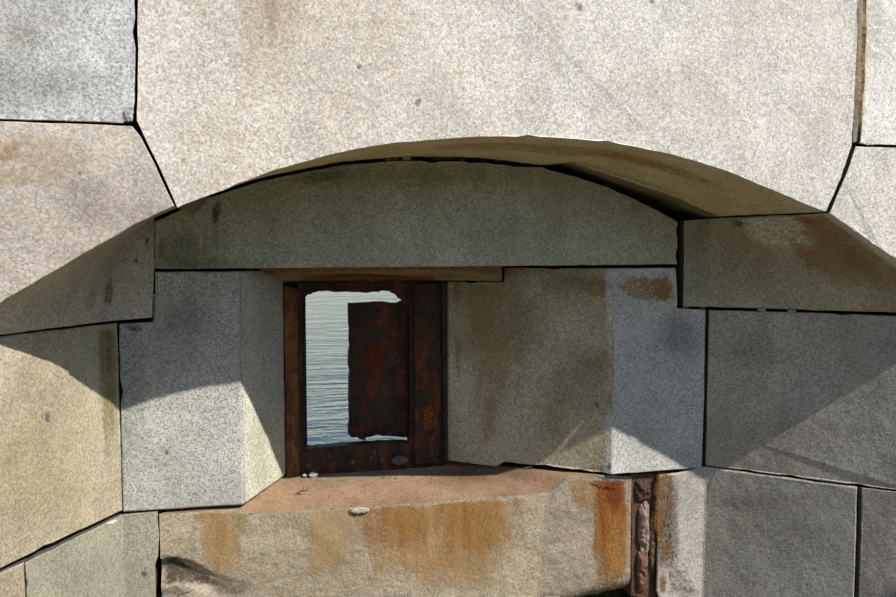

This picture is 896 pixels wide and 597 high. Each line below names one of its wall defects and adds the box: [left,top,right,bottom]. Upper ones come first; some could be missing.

rust [622,277,672,300]
rust [574,479,628,587]
rust [655,474,674,593]